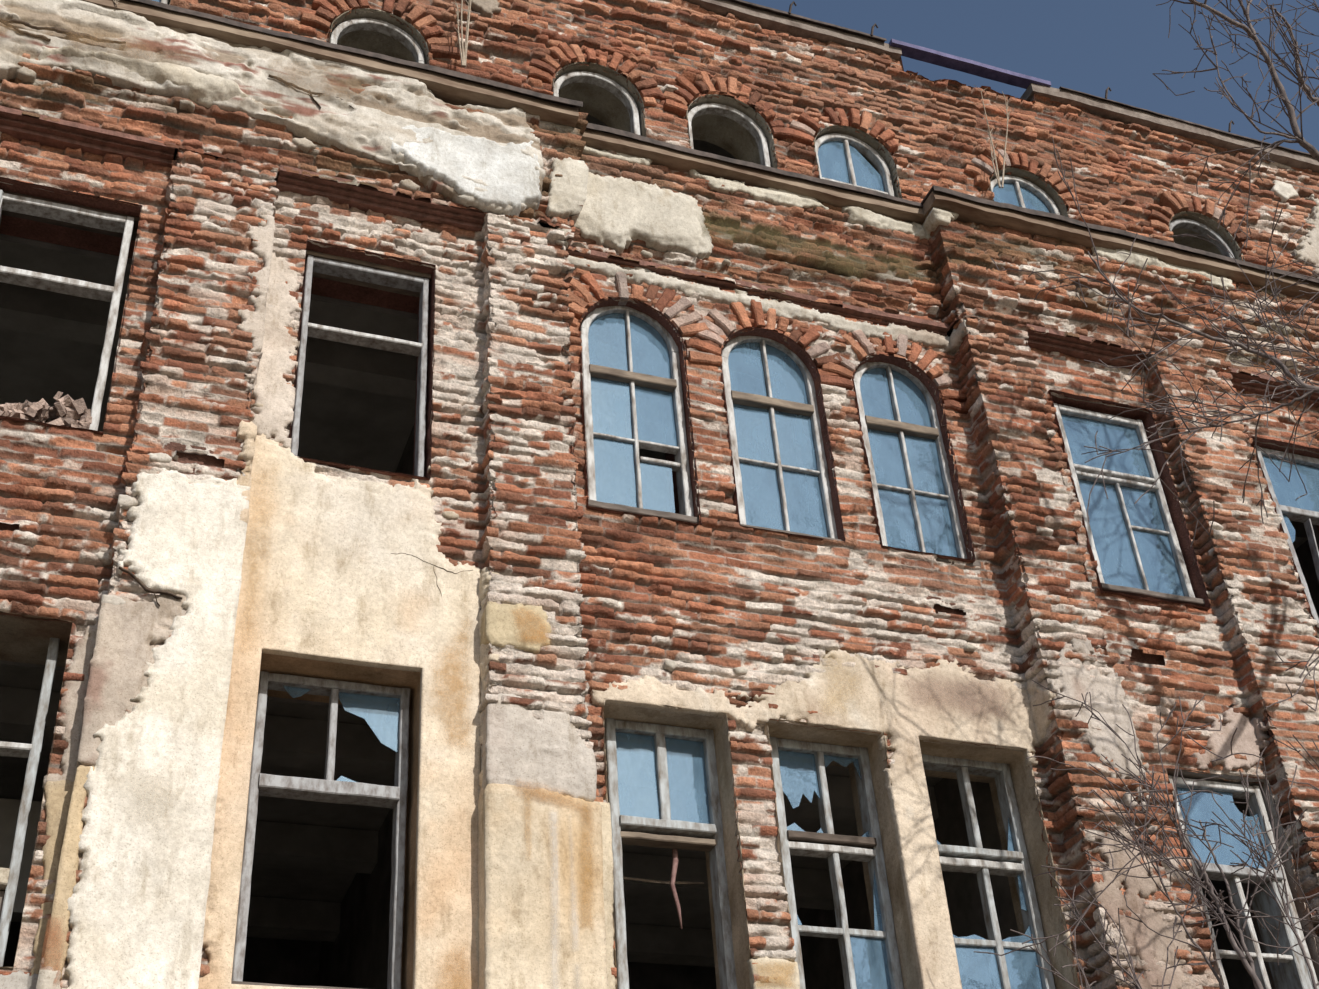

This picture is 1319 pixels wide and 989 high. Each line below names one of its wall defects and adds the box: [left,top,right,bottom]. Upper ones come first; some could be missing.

crack [0,18,125,44]
flaking render [0,0,967,354]
flaking render [0,214,616,989]
crack [391,553,471,596]
spalling [924,596,969,622]
flaking render [1190,703,1278,774]
flaking render [590,638,1203,989]